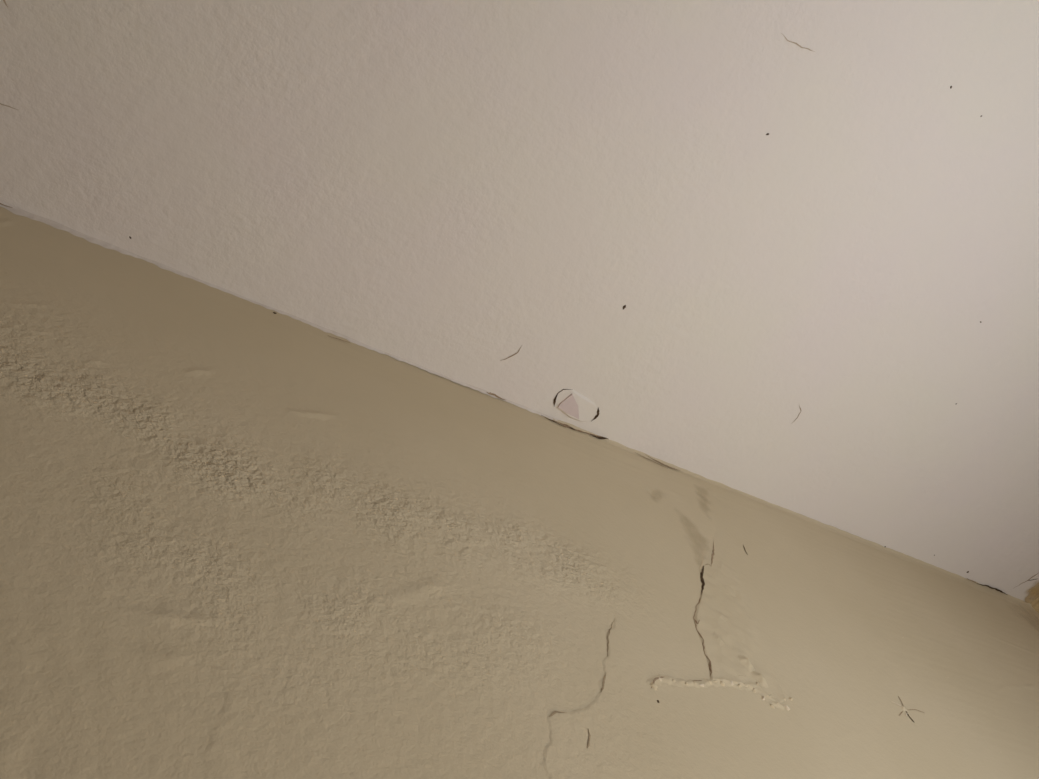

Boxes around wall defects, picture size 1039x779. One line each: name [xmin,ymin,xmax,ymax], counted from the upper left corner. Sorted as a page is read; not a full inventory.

peeling [553,388,599,422]
crack [693,542,748,678]